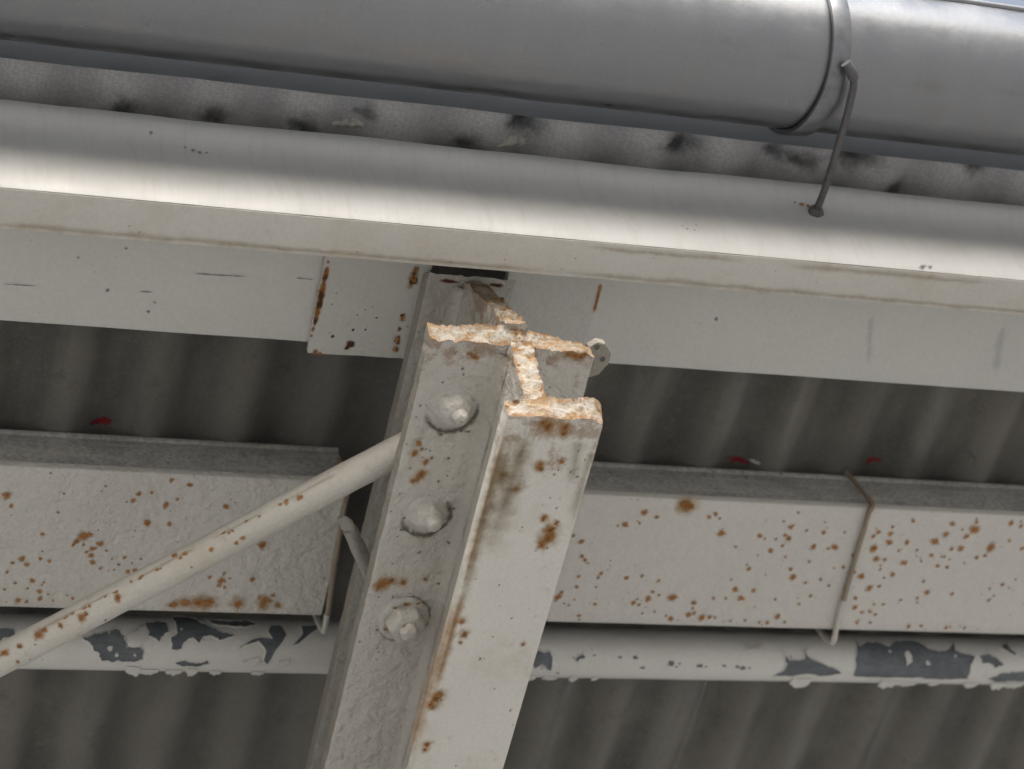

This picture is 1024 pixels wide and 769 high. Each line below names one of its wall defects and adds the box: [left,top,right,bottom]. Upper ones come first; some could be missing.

rust [311,261,329,337]
peeling [0,627,16,642]
rust [3,551,54,603]
rust [35,595,91,639]
rust [72,532,143,583]
peeling [81,616,318,677]
rust [539,515,558,548]
peeling [529,649,599,682]
rust [631,579,677,621]
rust [746,511,830,605]
peeling [769,638,1024,690]
rust [833,518,1024,624]